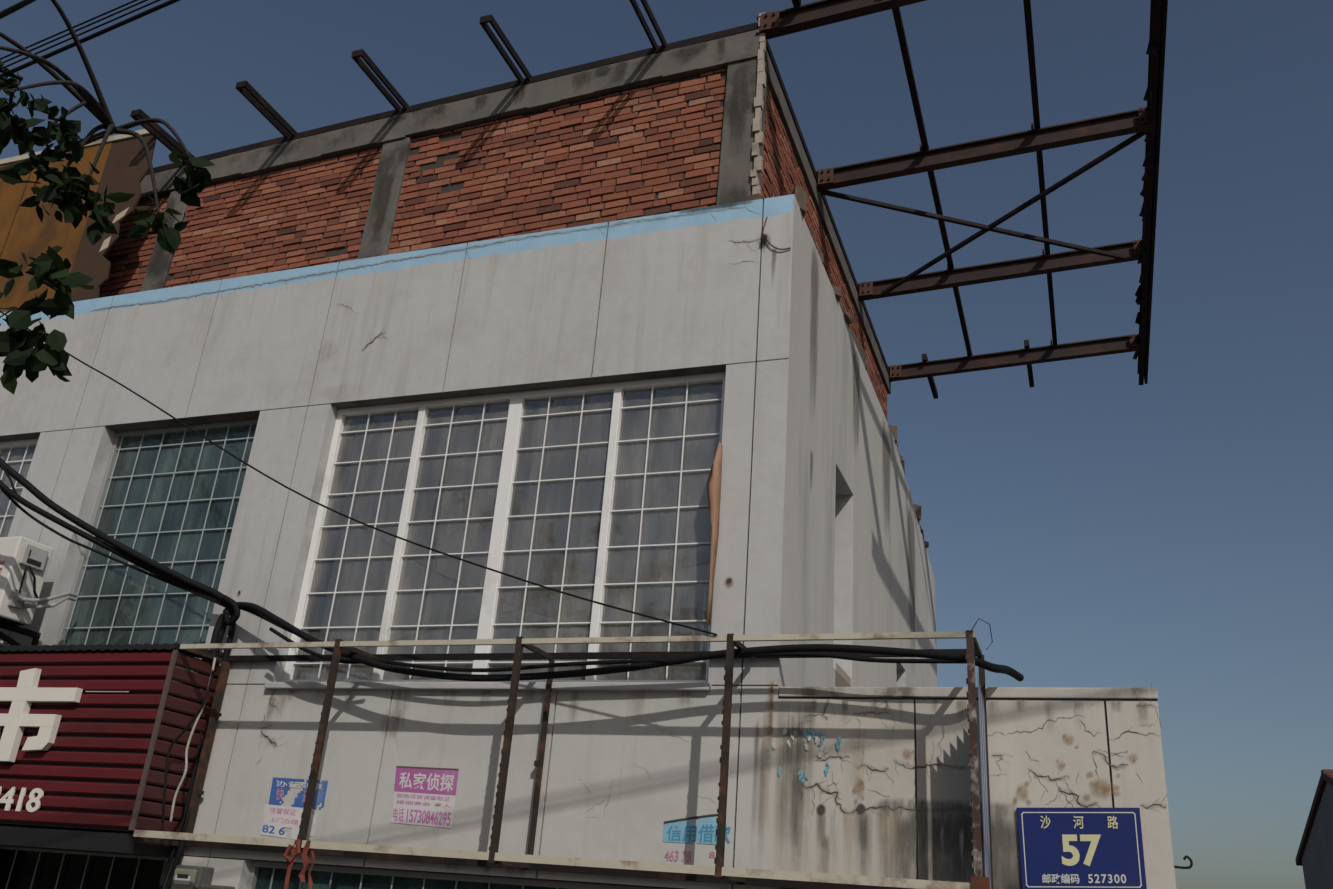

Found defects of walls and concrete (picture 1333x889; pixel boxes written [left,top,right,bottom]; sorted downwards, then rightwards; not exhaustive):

crack [91,203,765,312]
crack [787,680,1166,834]
damp [883,801,1022,889]